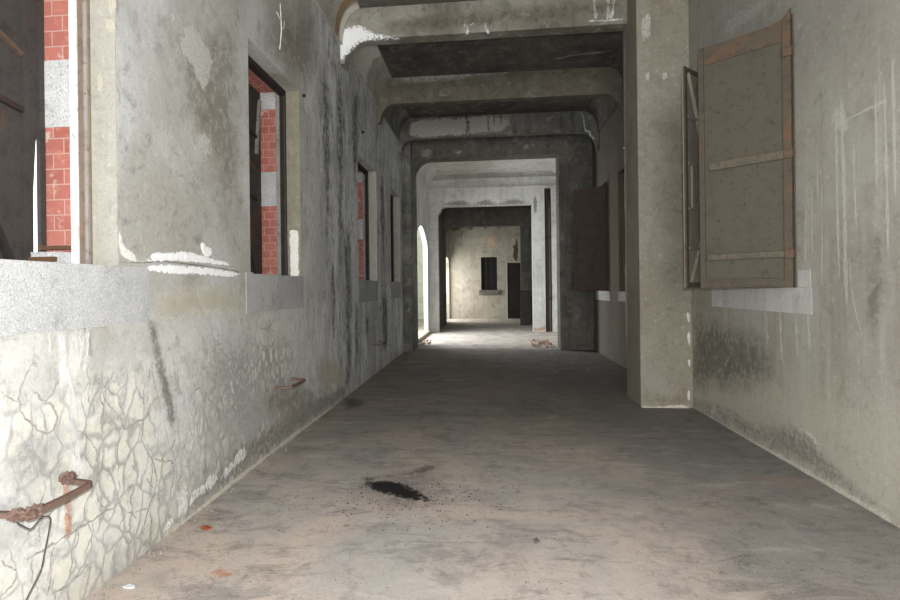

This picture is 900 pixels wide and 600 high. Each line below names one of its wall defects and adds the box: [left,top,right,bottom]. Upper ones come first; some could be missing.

peeling [340,25,399,85]
damp [832,85,897,335]
damp [149,321,175,425]
damp [693,313,768,386]
corrosion [63,485,72,536]
crack [0,362,180,596]
damp [163,387,360,533]
damp [701,405,888,520]